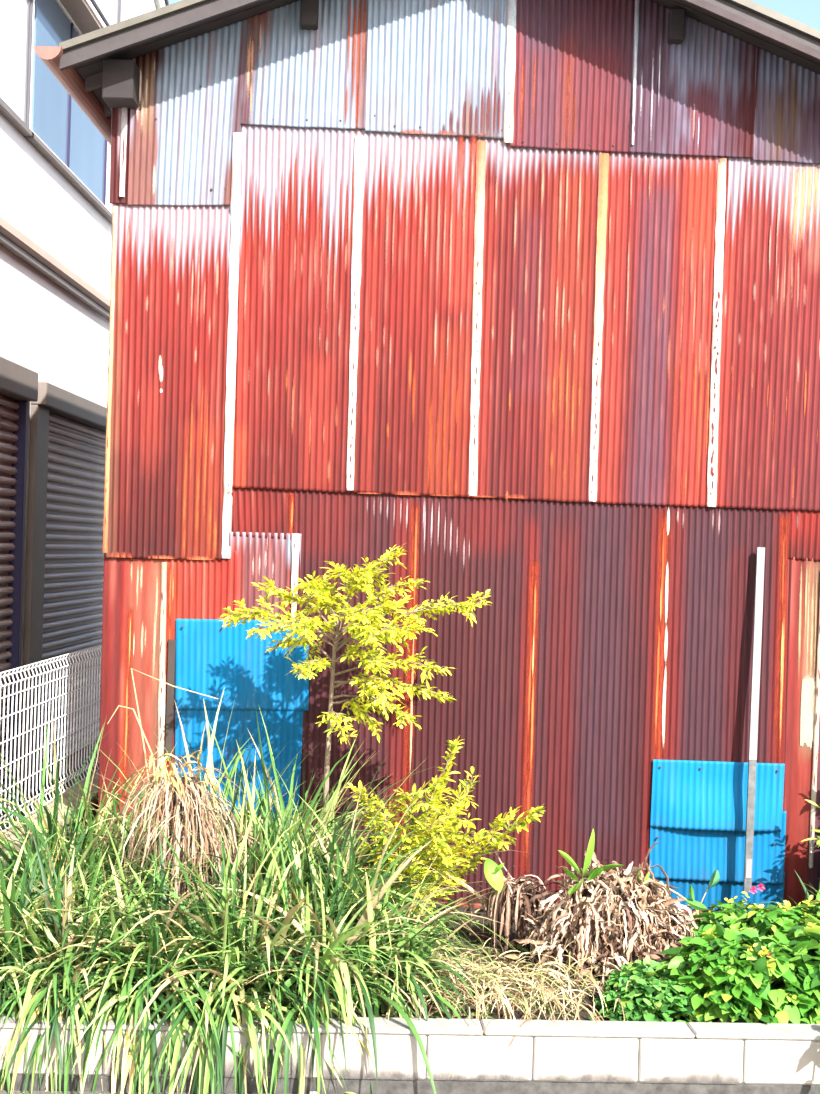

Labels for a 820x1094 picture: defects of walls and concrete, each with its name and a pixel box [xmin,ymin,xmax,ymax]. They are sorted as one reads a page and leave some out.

corrosion [520,65,535,124]
corrosion [248,160,354,262]
corrosion [790,167,819,239]
corrosion [428,368,459,496]
corrosion [552,351,581,437]
corrosion [673,358,709,498]
corrosion [123,609,134,797]
corrosion [397,492,418,788]
corrosion [524,562,538,864]
corrosion [654,515,668,760]
corrosion [775,516,788,752]